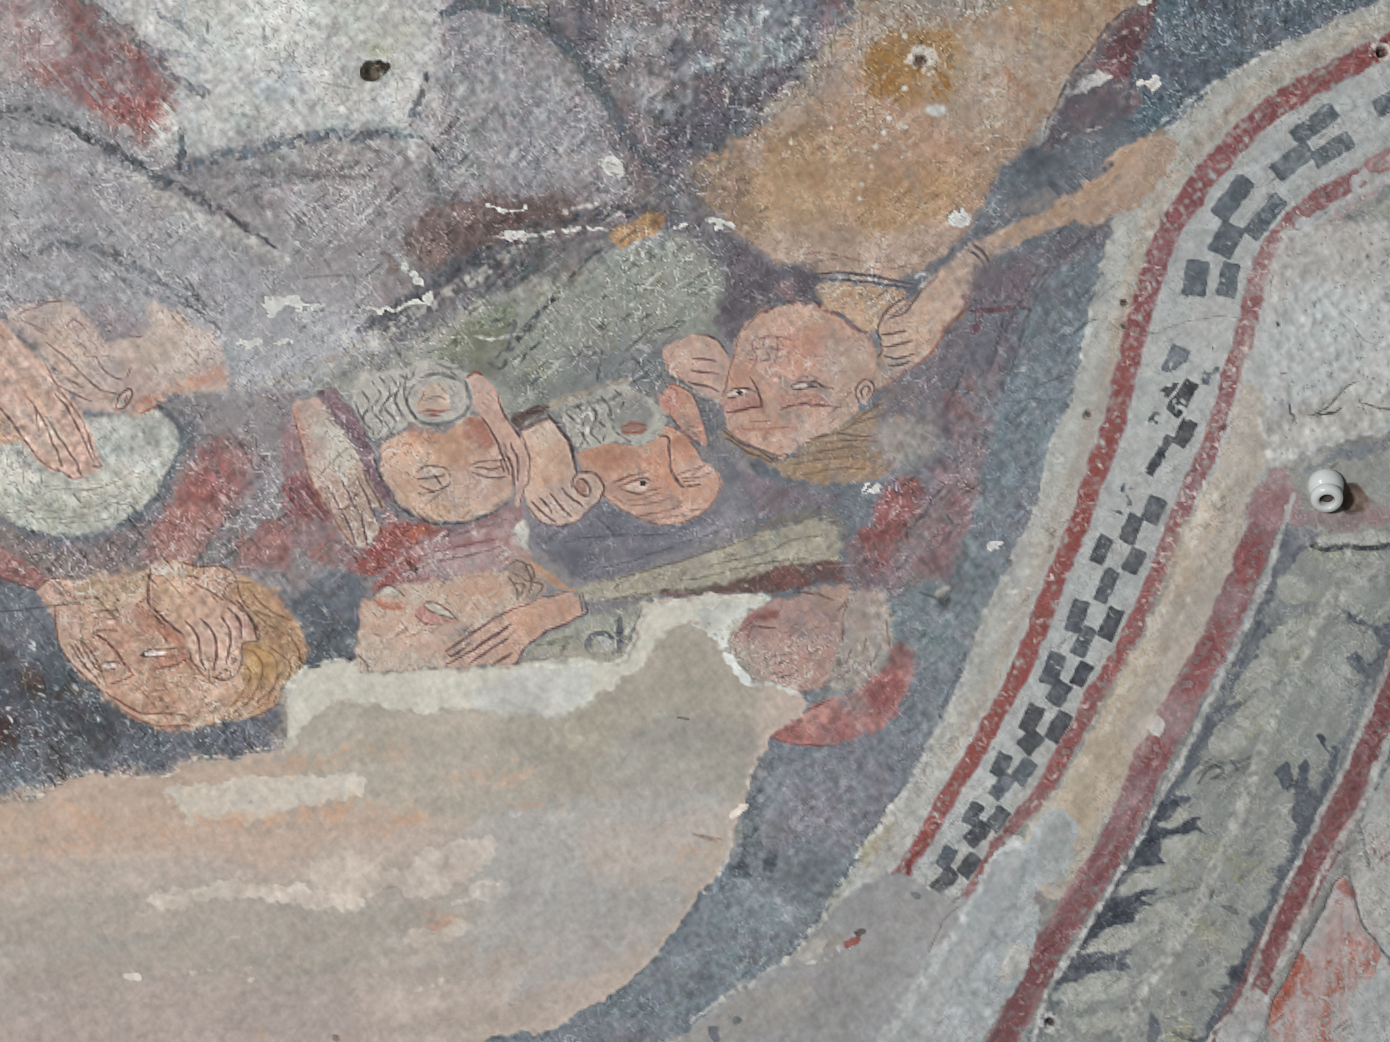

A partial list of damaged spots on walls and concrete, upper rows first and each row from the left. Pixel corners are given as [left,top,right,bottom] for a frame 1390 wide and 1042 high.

flaking render [0,589,810,1042]